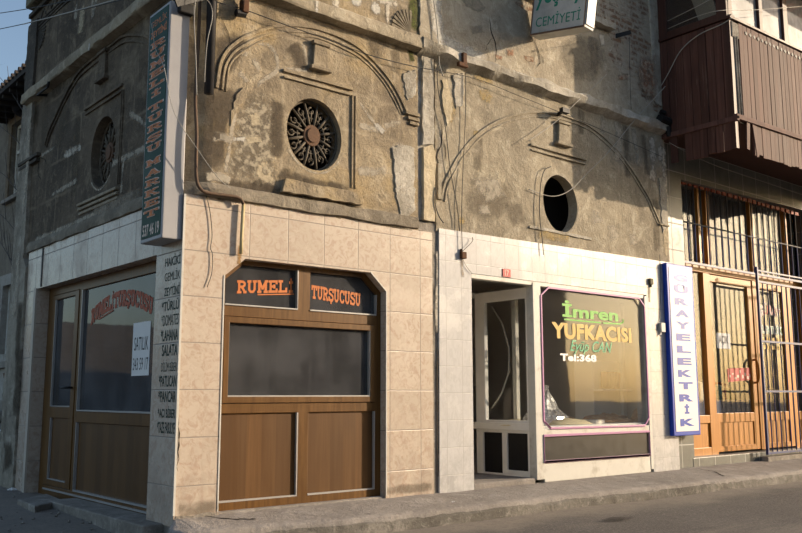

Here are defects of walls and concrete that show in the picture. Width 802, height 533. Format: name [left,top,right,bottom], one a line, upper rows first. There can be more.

flaking render [438,73,465,171]
flaking render [391,145,416,216]